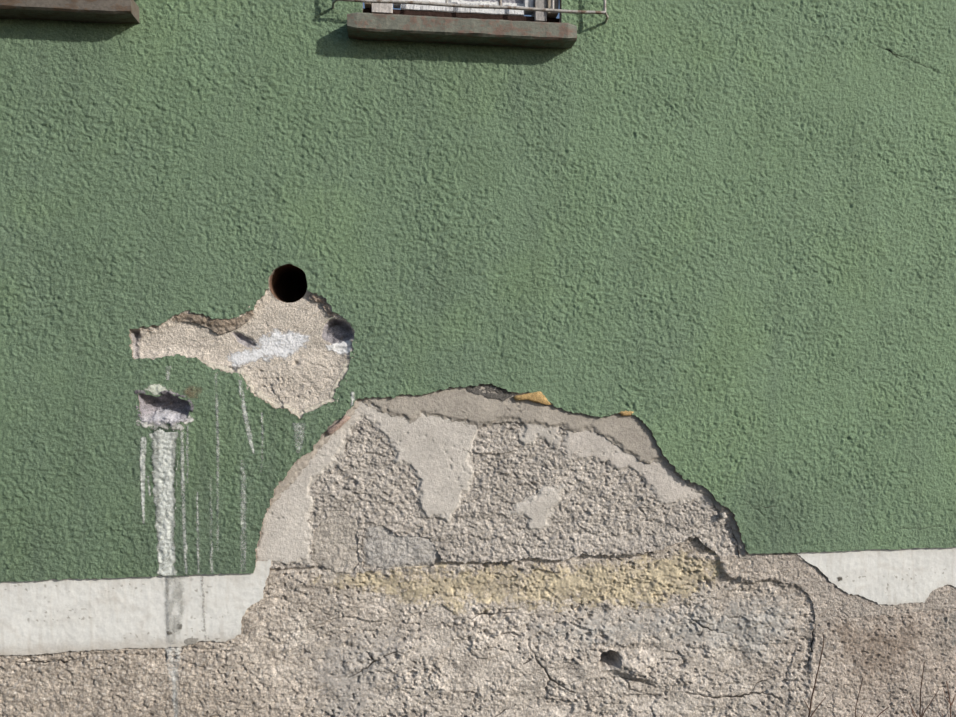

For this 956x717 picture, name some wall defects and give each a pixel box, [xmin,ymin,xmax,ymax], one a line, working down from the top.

spalling [130,287,357,419]
spalling [134,384,194,430]
water stain [239,381,263,453]
water stain [140,408,219,632]
spalling [240,383,956,717]
crack [523,649,573,694]
crack [693,679,784,705]